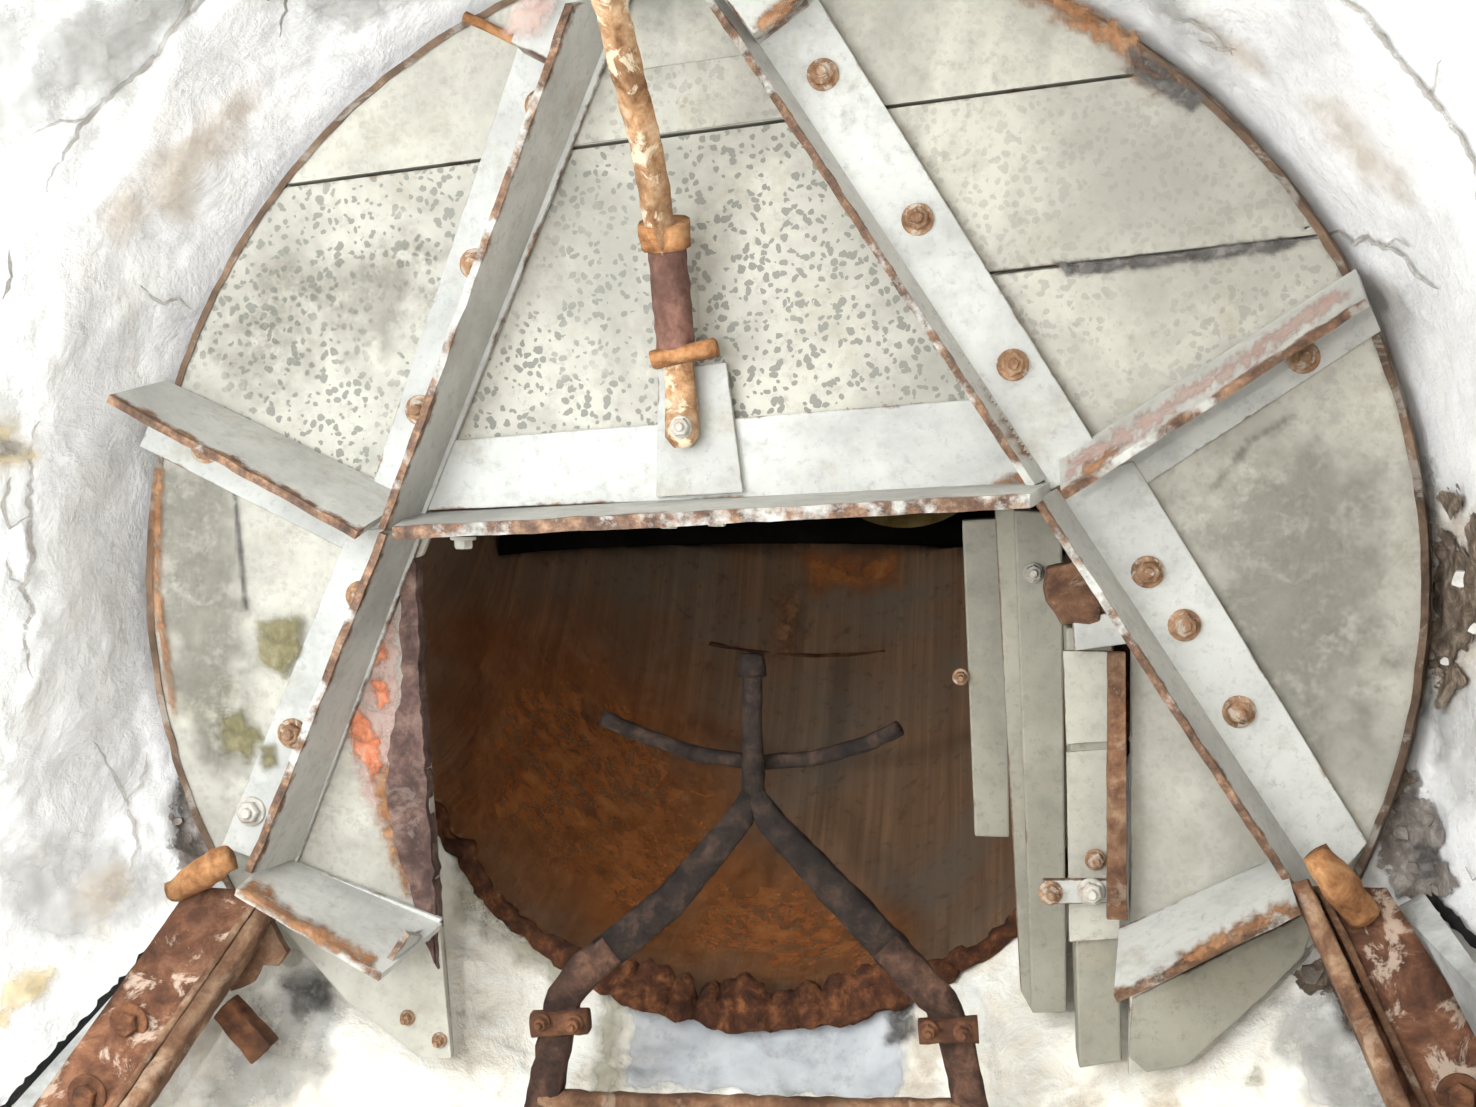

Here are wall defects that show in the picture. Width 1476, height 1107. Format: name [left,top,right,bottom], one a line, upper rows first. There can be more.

crack [33,0,205,193]
crack [267,0,288,37]
rust [1032,0,1183,84]
crack [1341,0,1476,176]
crack [1329,230,1439,290]
spalling [0,439,23,456]
crack [1,421,40,679]
spalling [1427,466,1476,715]
rust [1113,644,1130,757]
rust [434,796,582,970]
rust [593,957,914,1034]
rust [927,908,1017,984]